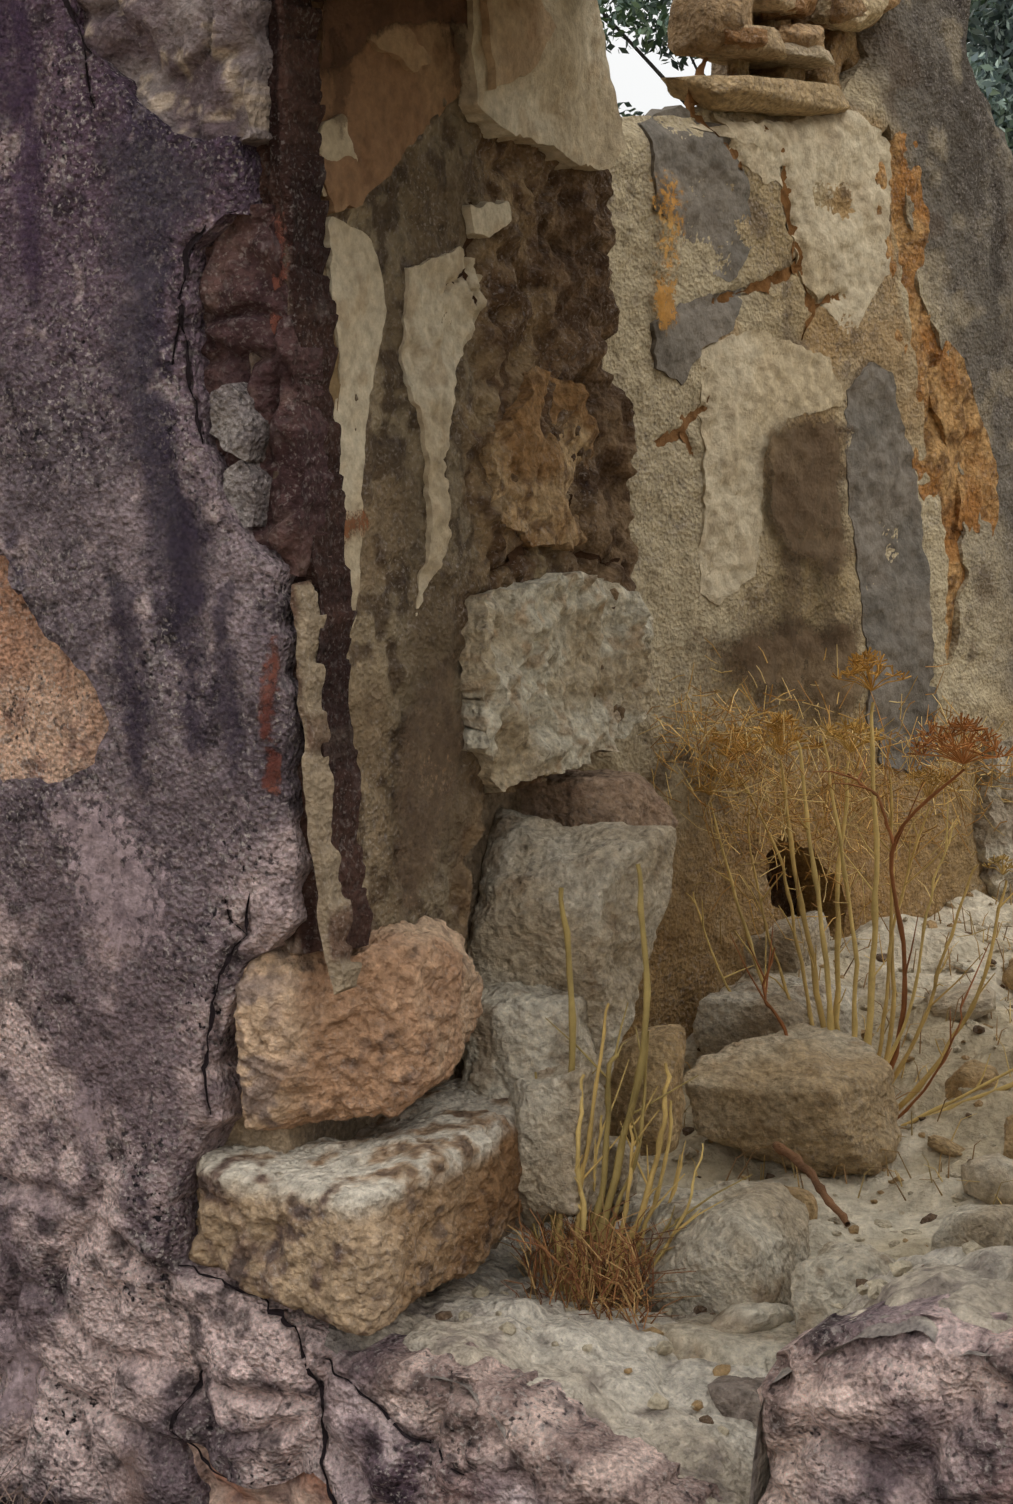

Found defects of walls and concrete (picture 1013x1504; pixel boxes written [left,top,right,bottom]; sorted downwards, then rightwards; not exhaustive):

crack [62,0,95,108]
spalling [76,0,273,147]
peeling [0,549,109,785]
crack [169,1369,227,1478]
crack [179,1265,476,1504]